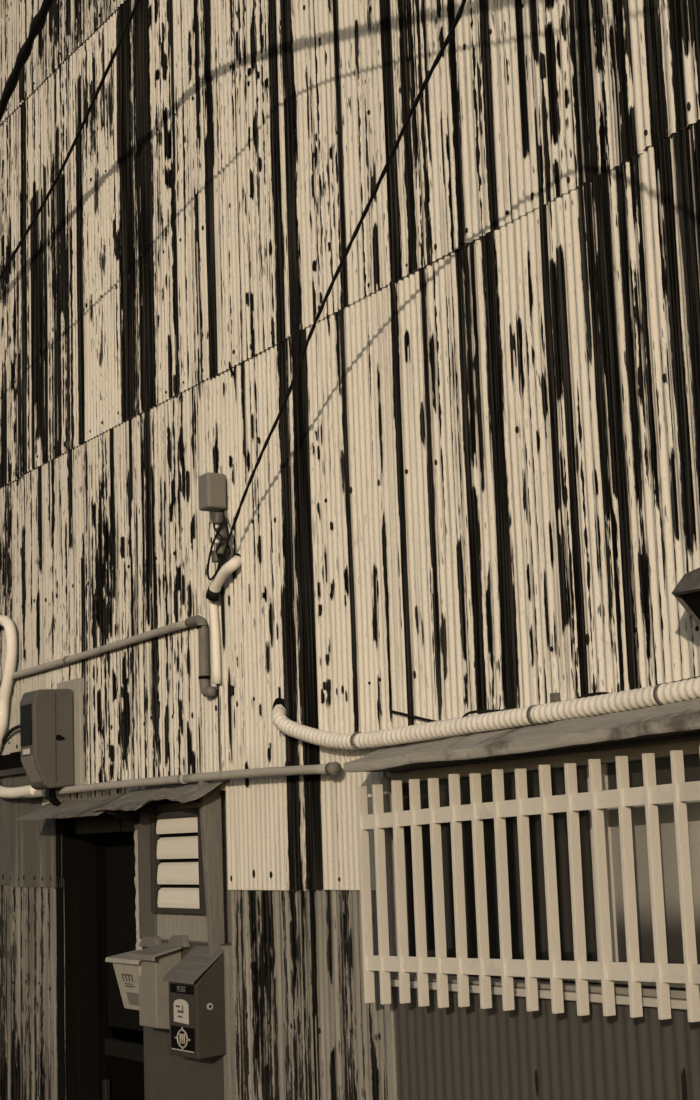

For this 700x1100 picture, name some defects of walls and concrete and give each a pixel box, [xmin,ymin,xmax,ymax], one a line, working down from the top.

rust [3,65,88,780]
rust [116,0,158,766]
rust [168,0,218,471]
rust [267,0,318,729]
rust [332,0,358,732]
rust [354,0,638,730]
rust [642,0,700,589]
rust [2,1029,44,1100]
rust [285,734,339,1100]
rust [344,890,353,982]
rust [371,1034,379,1100]